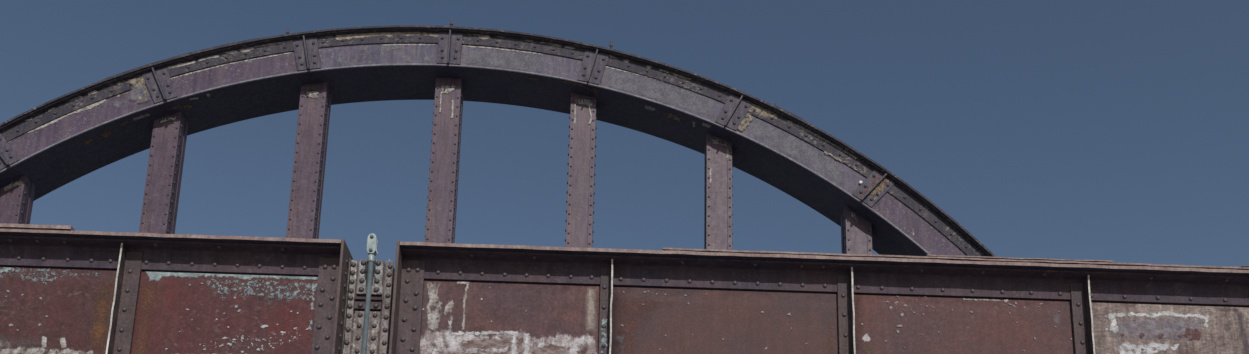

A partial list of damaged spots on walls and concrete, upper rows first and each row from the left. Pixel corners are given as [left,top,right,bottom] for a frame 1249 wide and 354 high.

peeling [0,267,98,299]
peeling [0,315,93,354]
peeling [146,272,318,353]
peeling [420,282,608,354]
peeling [1105,306,1209,354]